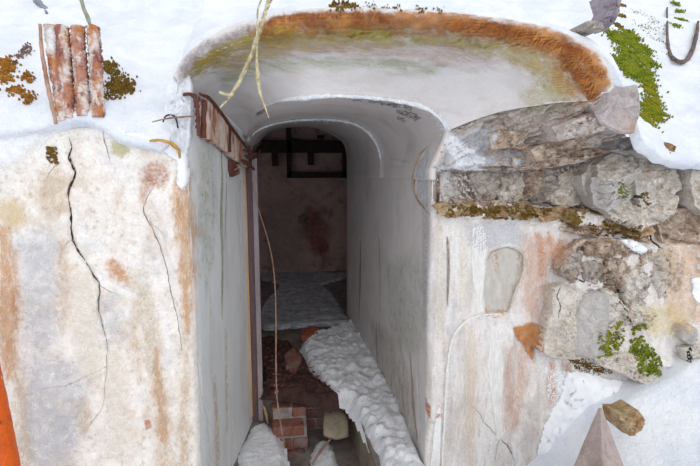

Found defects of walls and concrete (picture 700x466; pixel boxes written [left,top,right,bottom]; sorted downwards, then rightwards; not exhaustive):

crack [26,138,116,432]
crack [143,190,182,348]
rust [174,178,197,333]